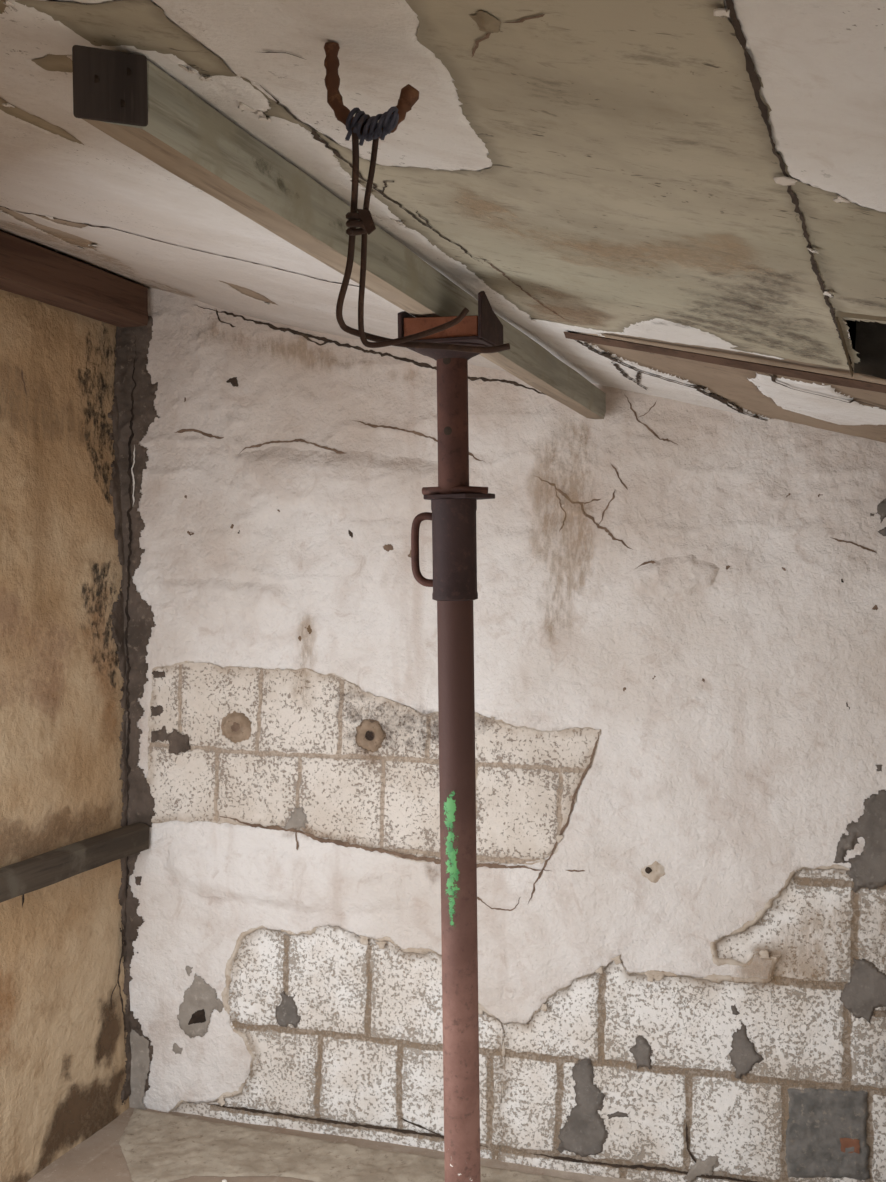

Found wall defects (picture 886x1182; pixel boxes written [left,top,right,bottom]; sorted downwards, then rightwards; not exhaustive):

peeling [0,0,886,443]
crack [197,305,437,370]
crack [536,464,631,549]
leakage [82,562,119,686]
peeling [108,396,128,827]
spalling [146,661,440,863]
spalling [475,712,601,865]
leakage [15,1001,125,1182]
peeling [118,857,132,1105]
spalling [170,925,444,1152]
spalling [478,864,886,1182]